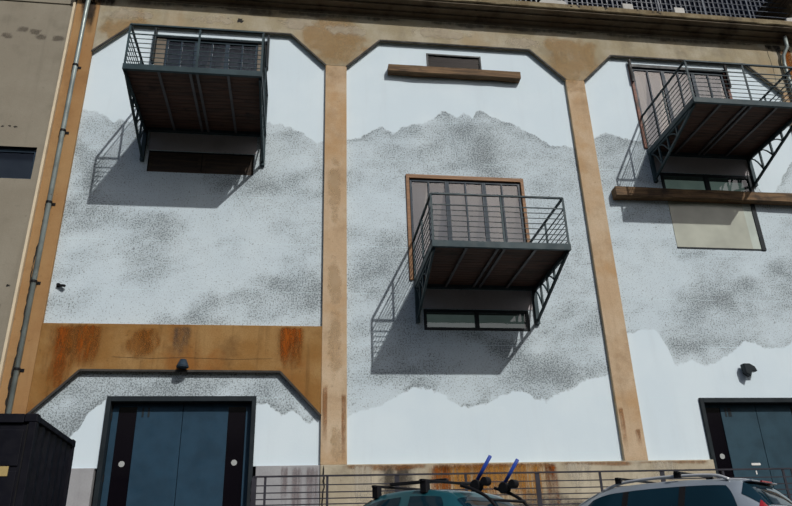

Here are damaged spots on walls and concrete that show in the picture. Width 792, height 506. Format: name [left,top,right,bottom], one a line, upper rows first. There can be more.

corrosion [54,325,98,376]
corrosion [280,328,301,359]
crack [319,466,327,506]
corrosion [432,463,559,499]